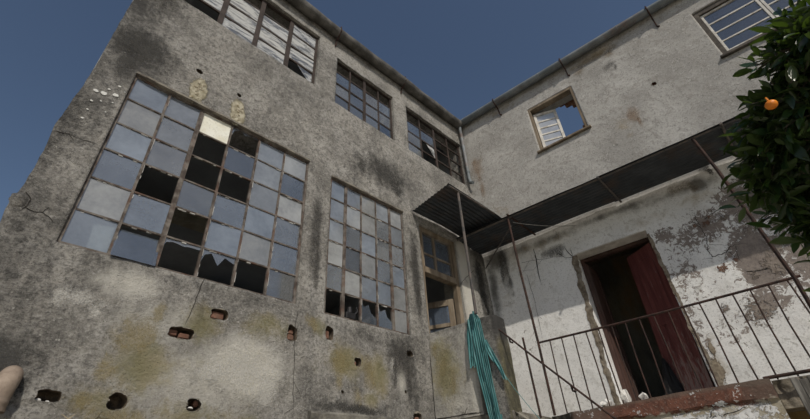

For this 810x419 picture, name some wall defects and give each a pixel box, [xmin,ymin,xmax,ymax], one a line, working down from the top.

spalling [188,69,208,104]
spalling [229,93,246,125]
leakage [359,156,404,196]
leakage [311,204,321,286]
peeling [693,205,791,279]
spalling [210,308,228,320]
spalling [647,234,726,386]
peeling [721,295,778,329]
spalling [167,326,199,340]
peeling [693,401,752,419]